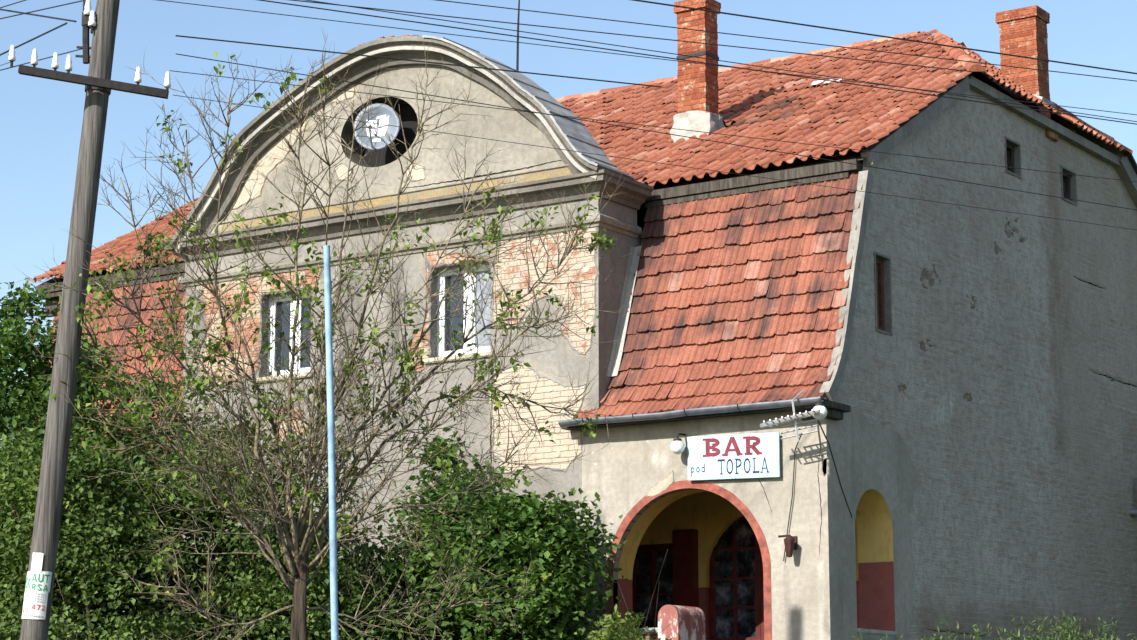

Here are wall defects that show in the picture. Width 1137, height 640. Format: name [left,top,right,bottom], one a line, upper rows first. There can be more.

flaking render [404,226,599,375]
crack [1088,369,1137,387]